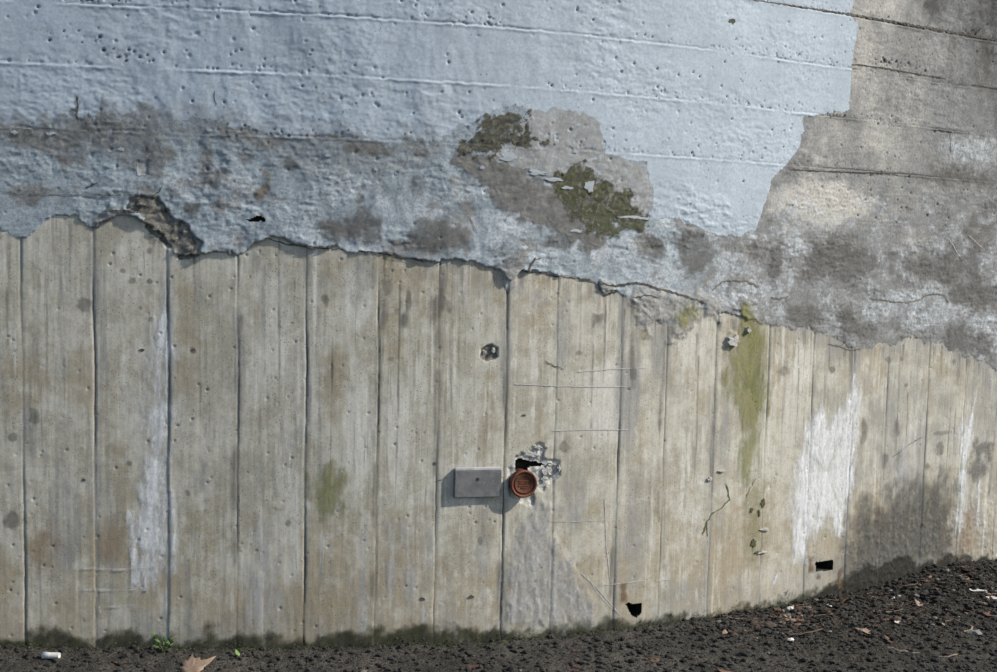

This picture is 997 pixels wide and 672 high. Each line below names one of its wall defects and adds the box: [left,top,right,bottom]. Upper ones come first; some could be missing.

peeling [451,107,654,254]
spalling [127,196,203,260]
crack [521,257,789,304]
spalling [480,345,498,361]
damp [128,311,177,588]
spalling [508,442,561,507]
crack [702,470,757,537]
damp [792,374,862,563]
damp [810,399,994,601]
spalling [625,602,642,618]